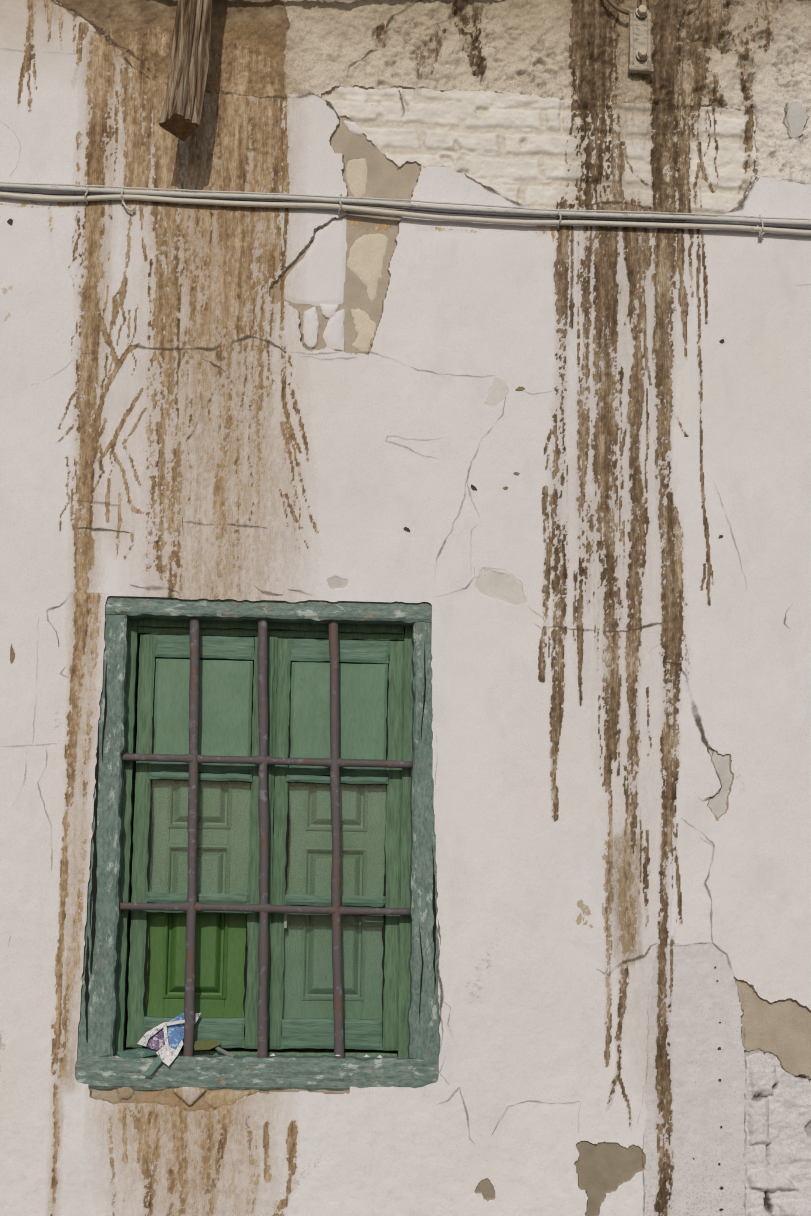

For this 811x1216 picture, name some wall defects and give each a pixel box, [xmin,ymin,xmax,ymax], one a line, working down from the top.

spalling [57,0,178,78]
spalling [207,0,811,355]
leakage [17,0,319,1216]
peeling [475,569,527,605]
leakage [538,0,719,1216]
flaking render [707,747,734,821]
spalling [88,1084,350,1112]
spalling [733,977,811,1216]
spalling [474,1178,495,1201]
spalling [574,1141,646,1216]